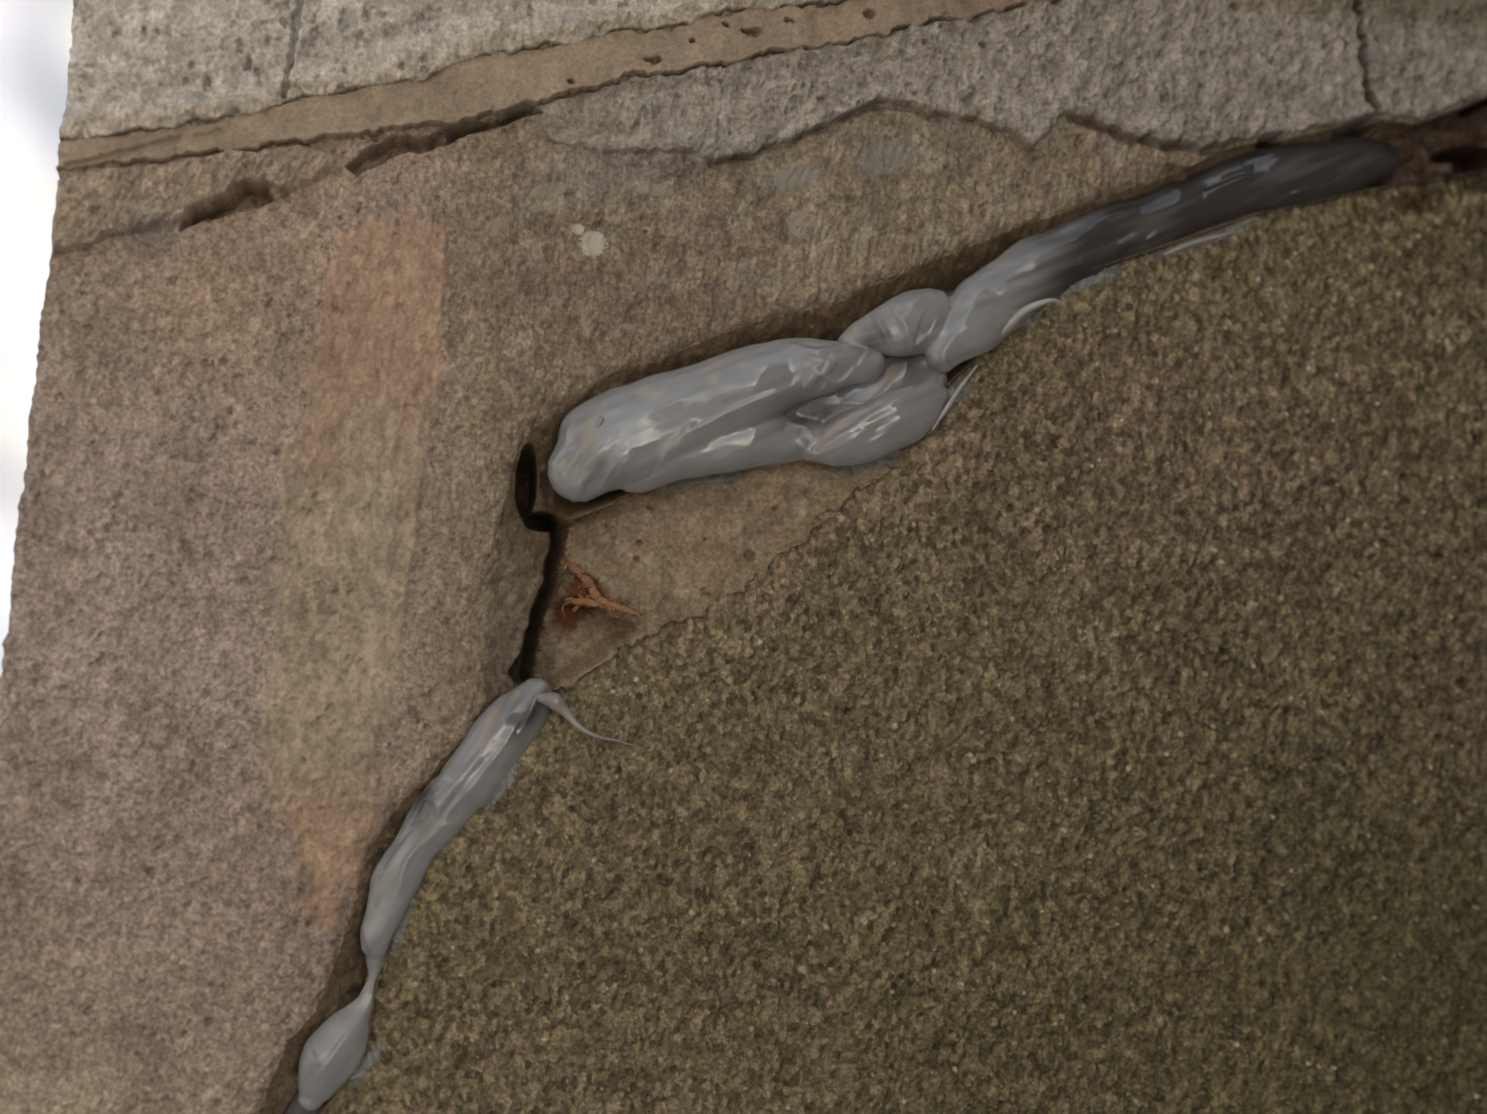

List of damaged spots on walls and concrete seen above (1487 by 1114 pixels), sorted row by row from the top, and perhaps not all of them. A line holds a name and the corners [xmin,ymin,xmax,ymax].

spalling [51,111,532,257]
spalling [534,425,940,692]
crack [260,0,1393,1114]